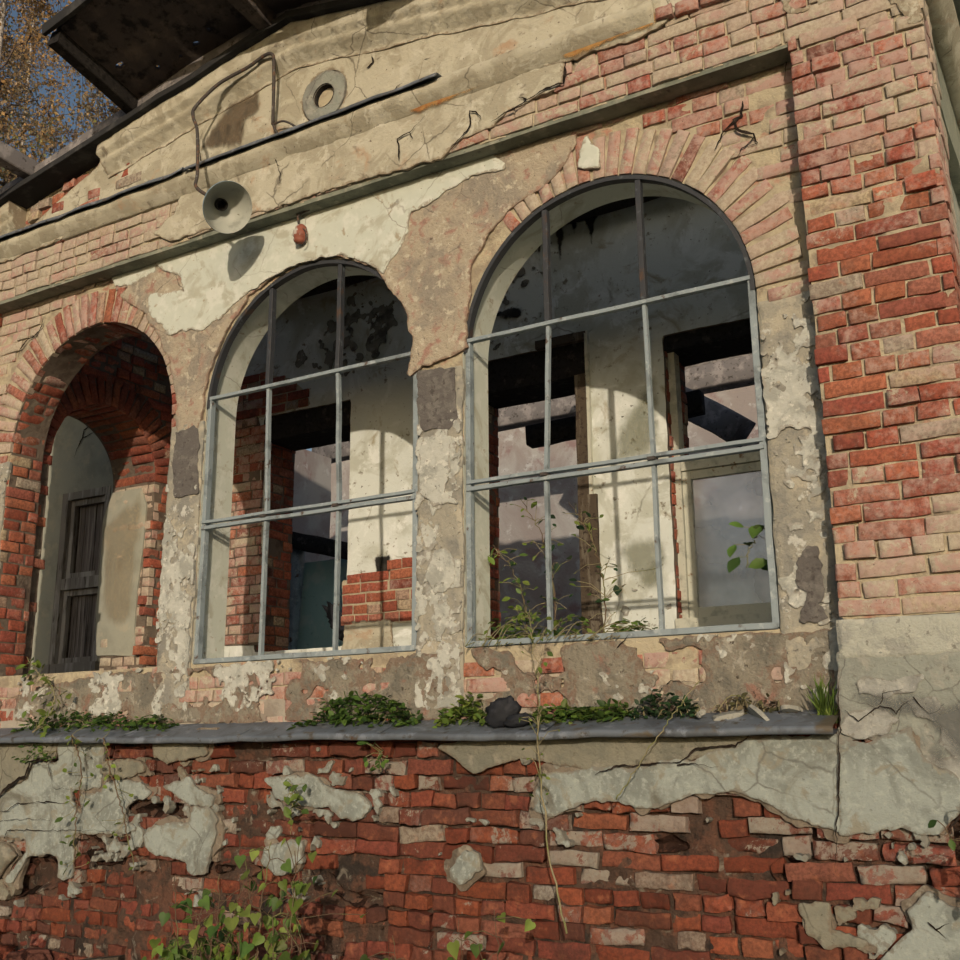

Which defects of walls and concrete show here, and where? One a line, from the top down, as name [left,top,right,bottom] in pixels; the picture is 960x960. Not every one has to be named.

crack [397,114,425,158]
crack [451,61,567,147]
crack [714,101,758,164]
peeling [14,129,960,866]
crack [595,735,749,775]
crack [835,683,941,872]
peeling [0,743,241,907]
peeling [248,760,400,908]
peeling [438,845,487,891]
peeling [770,853,811,906]
peeling [798,884,960,960]